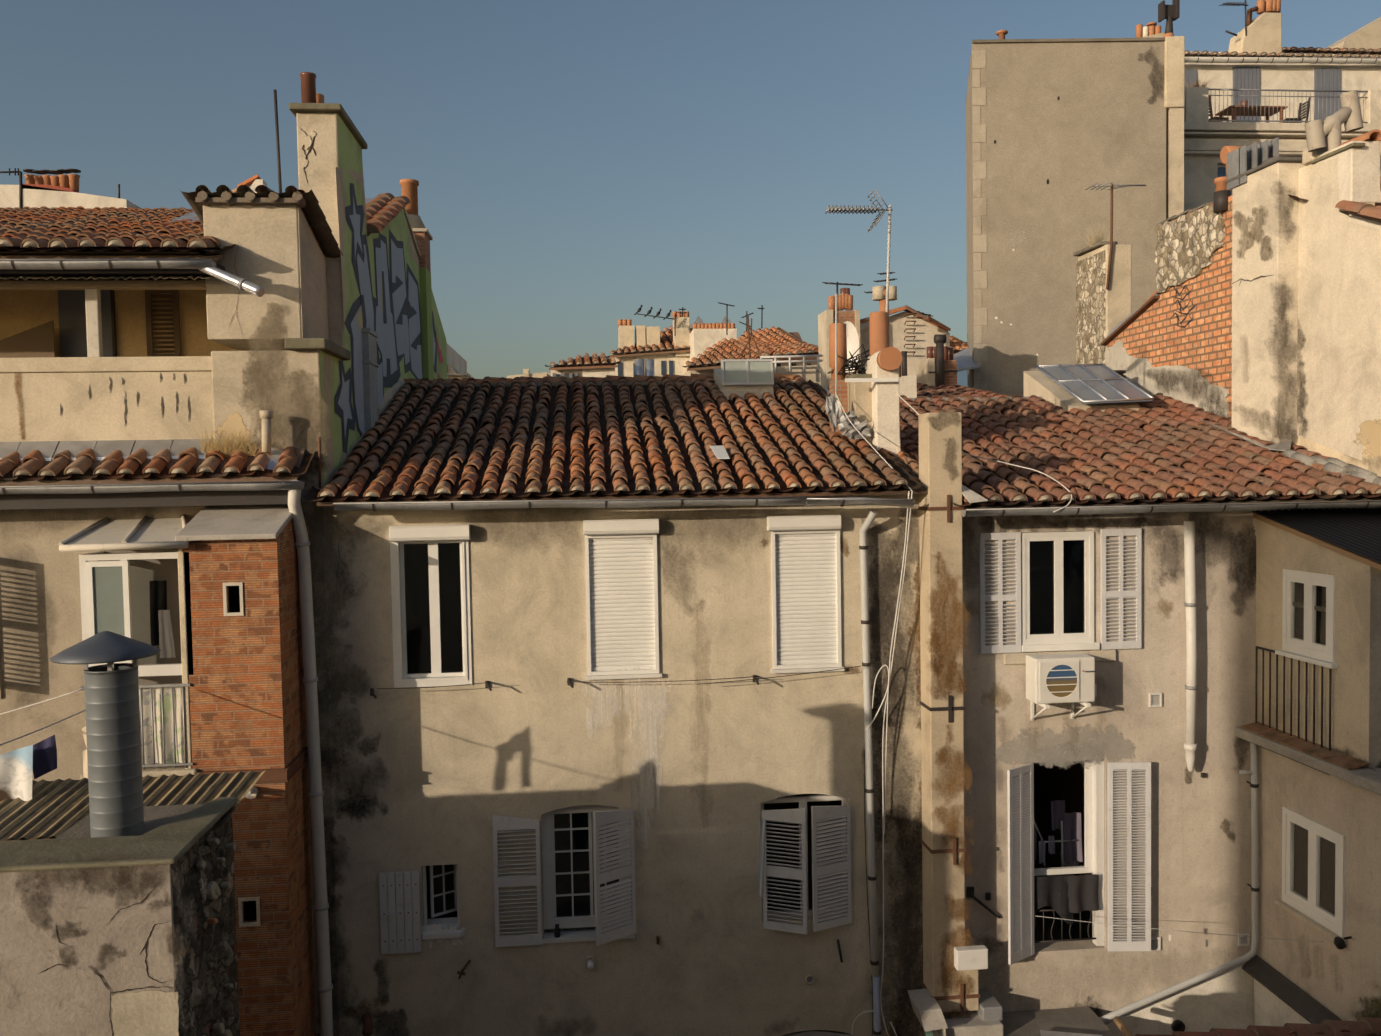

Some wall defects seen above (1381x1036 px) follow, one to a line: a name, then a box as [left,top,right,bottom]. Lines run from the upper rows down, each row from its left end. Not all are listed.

damp [1235,183,1293,261]
damp [1266,286,1307,444]
corrosion [908,552,968,701]
damp [308,506,386,1033]
damp [863,509,923,1036]
corrosion [918,733,971,874]
crack [38,881,178,1036]
corrosion [941,898,972,1019]